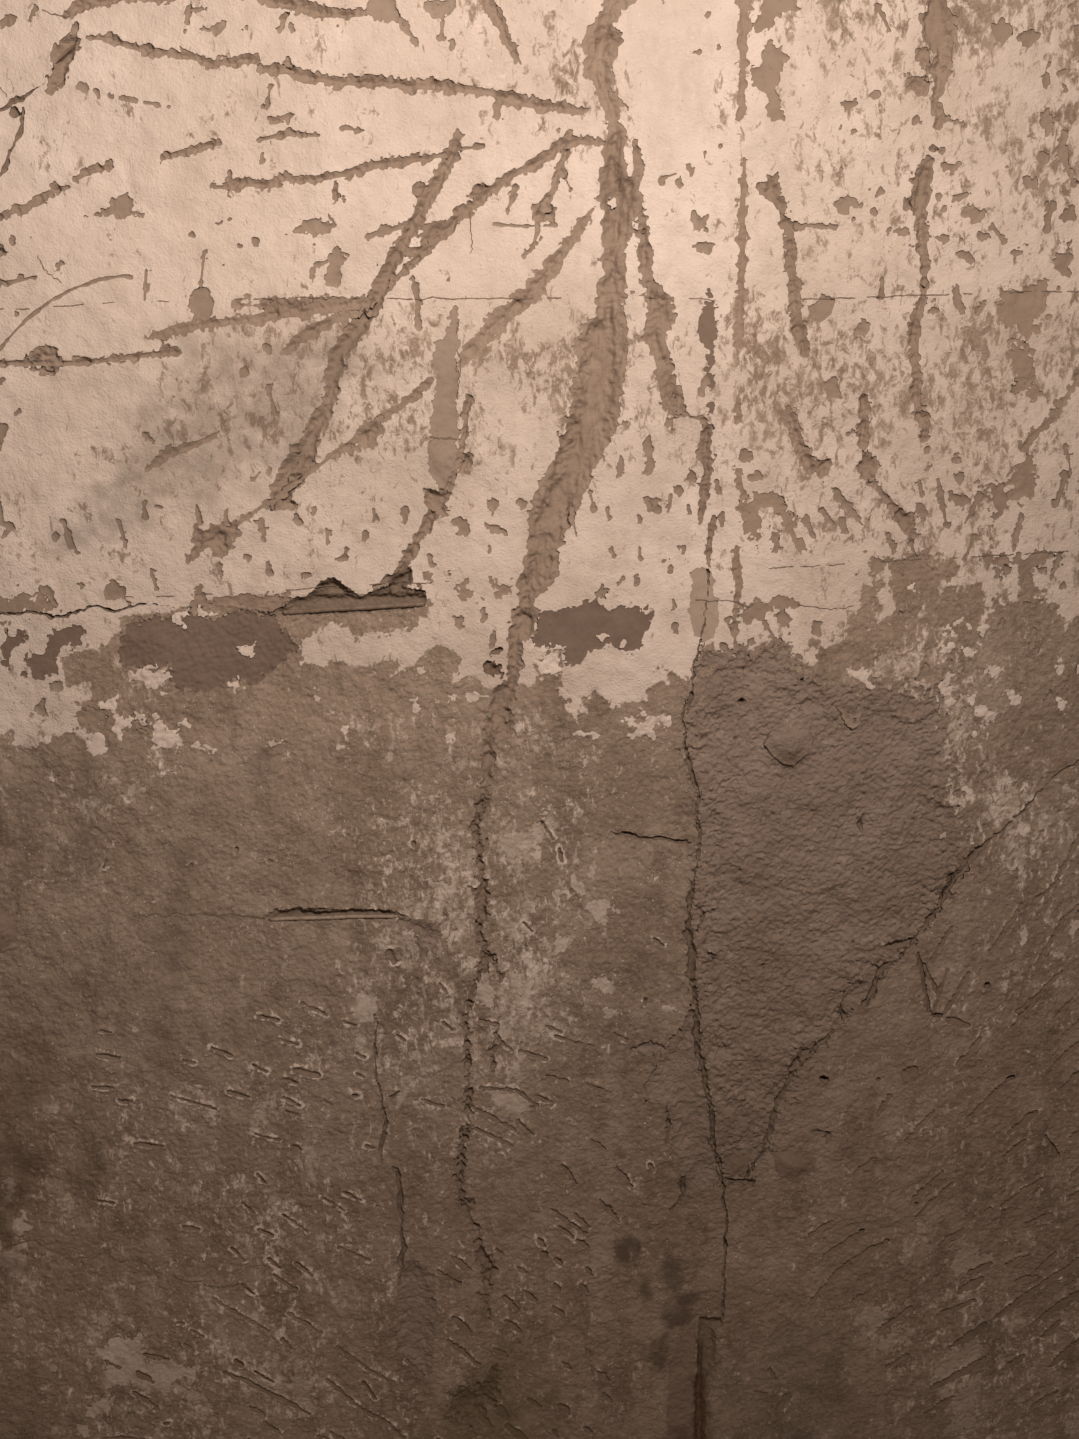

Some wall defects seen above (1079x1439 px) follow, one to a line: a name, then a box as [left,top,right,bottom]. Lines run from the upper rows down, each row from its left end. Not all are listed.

peeling [750,0,801,122]
peeling [231,181,350,310]
crack [0,593,212,620]
peeling [185,444,317,612]
crack [258,585,336,617]
crack [370,579,449,587]
peeling [636,448,863,553]
crack [880,551,1068,563]
peeling [914,446,1066,608]
spalling [630,567,989,1198]
crack [611,563,1079,1320]
crack [451,798,507,1320]